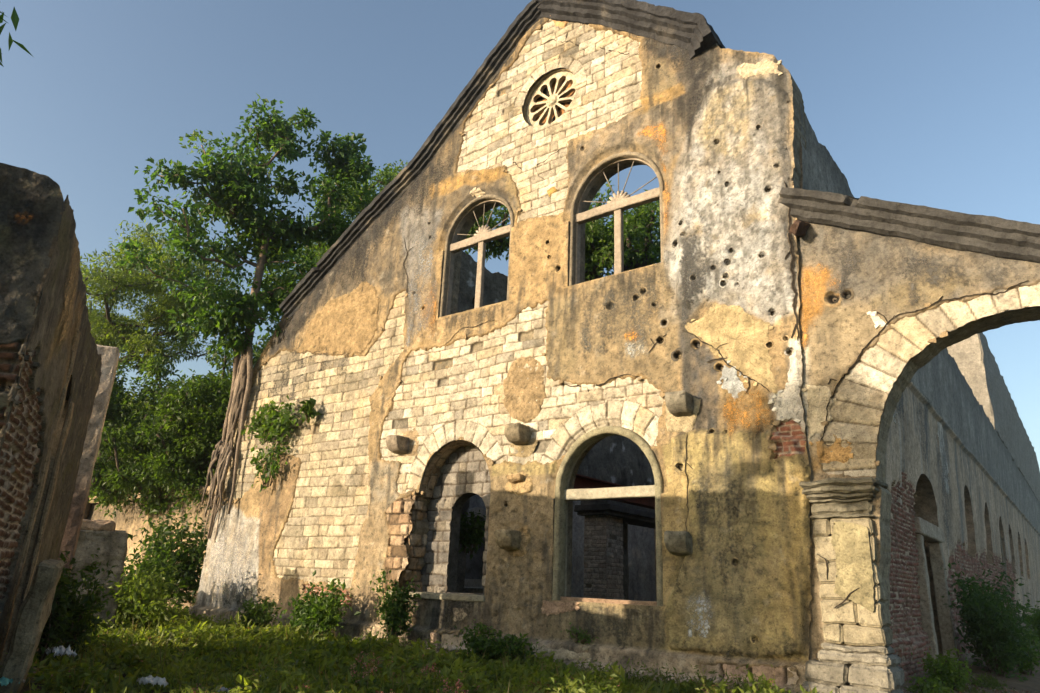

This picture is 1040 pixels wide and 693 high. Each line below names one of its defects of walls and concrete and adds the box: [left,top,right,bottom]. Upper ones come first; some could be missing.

spalling [457,19,643,223]
damp [680,231,710,324]
crack [784,181,799,341]
crack [556,330,772,394]
crack [820,280,1029,442]
spalling [0,342,43,600]
spalling [222,291,666,607]
spalling [430,608,478,653]
peeling [541,600,580,616]
damp [696,463,755,583]
damp [682,597,799,660]
spalling [887,468,931,681]